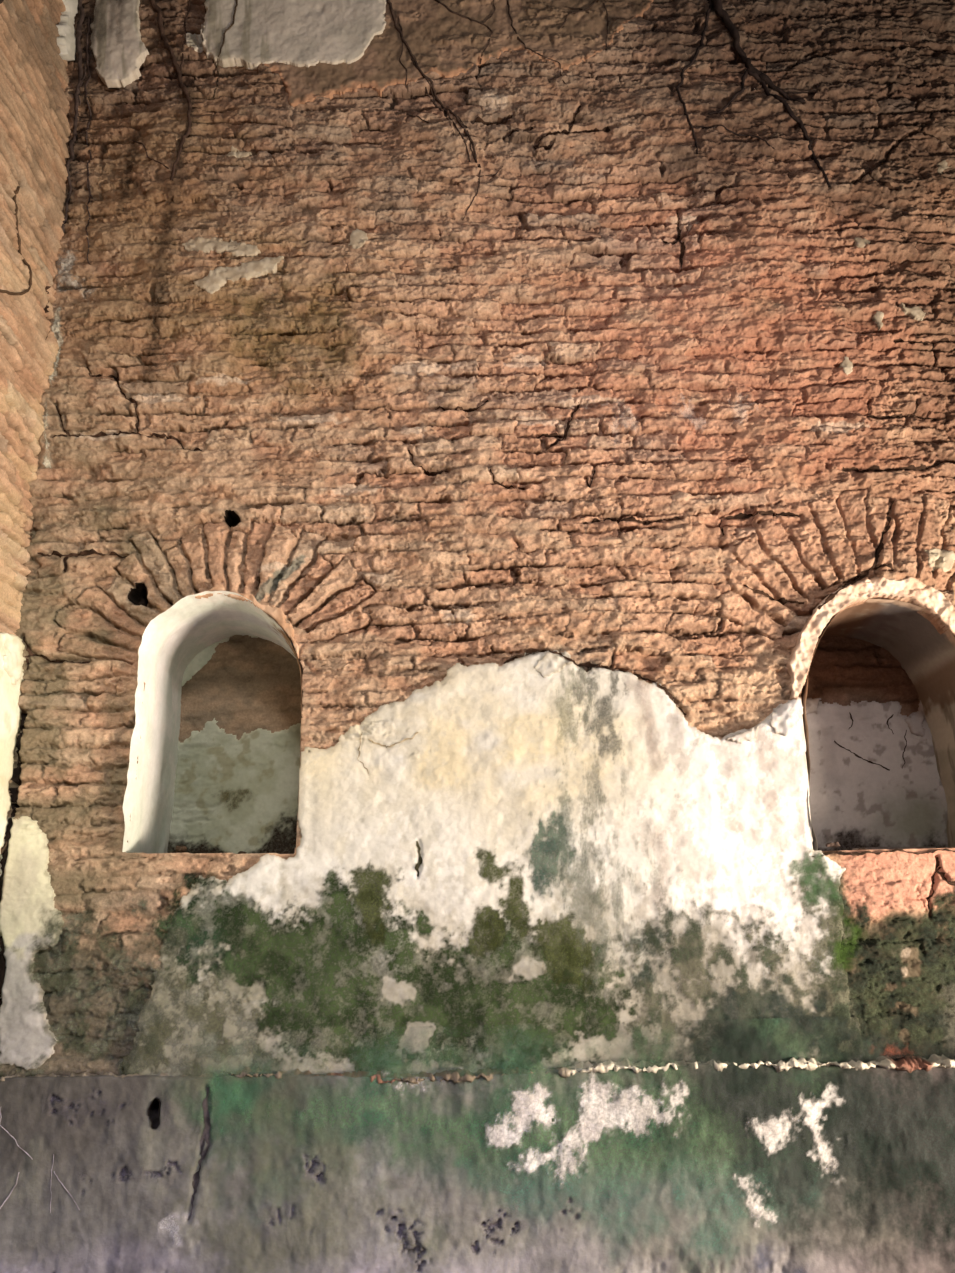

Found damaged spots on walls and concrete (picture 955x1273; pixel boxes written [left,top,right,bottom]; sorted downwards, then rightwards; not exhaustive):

peeling [56,0,150,88]
peeling [184,0,654,107]
crack [663,213,686,272]
crack [52,367,202,451]
crack [744,462,954,610]
peeling [182,635,258,686]
water stain [468,849,596,993]
peeling [124,650,948,1076]
water stain [618,853,862,1062]
crack [926,857,955,916]
water stain [487,1075,689,1179]
water stain [753,1086,842,1168]